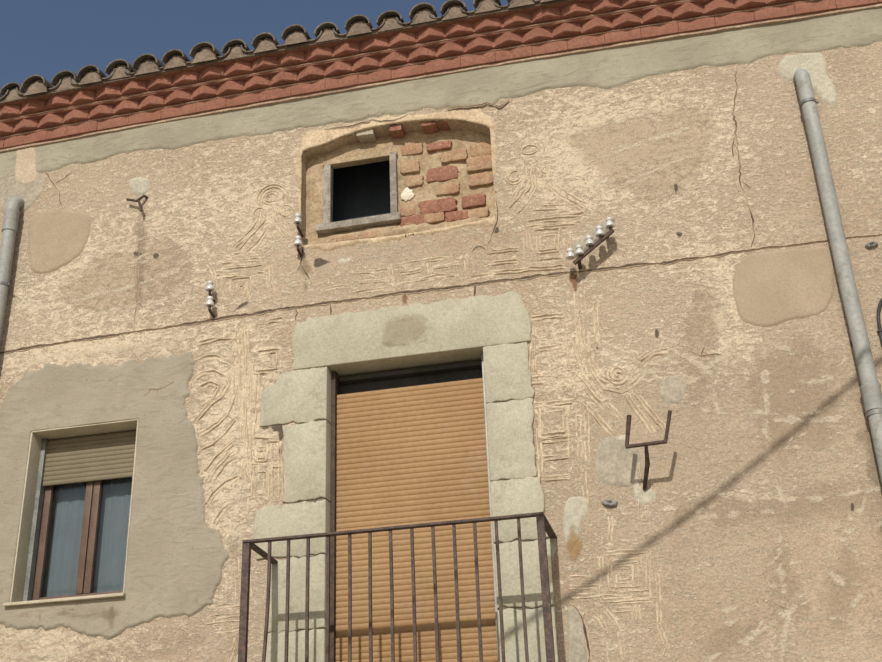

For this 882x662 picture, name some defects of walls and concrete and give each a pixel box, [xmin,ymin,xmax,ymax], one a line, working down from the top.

crack [0,64,882,355]